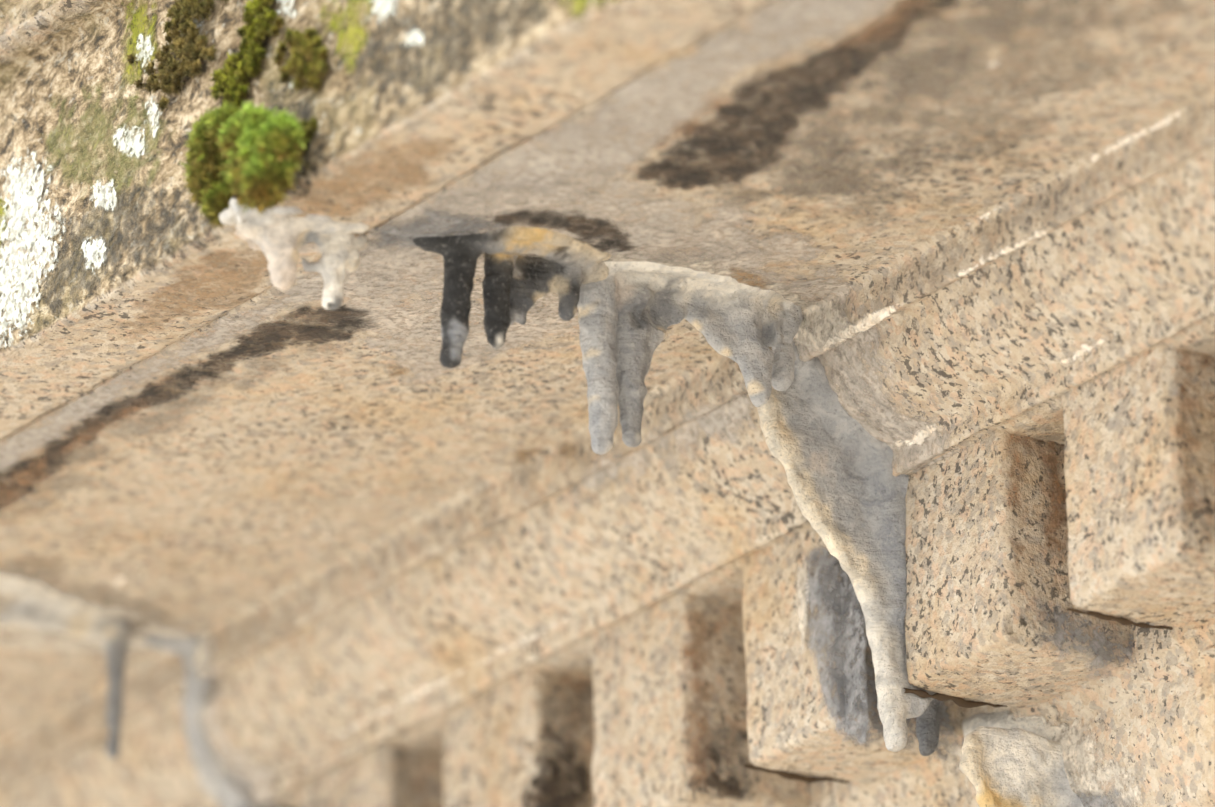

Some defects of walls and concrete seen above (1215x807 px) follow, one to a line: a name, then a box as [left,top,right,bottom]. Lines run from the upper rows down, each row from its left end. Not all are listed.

water stain [0,0,957,756]
water stain [0,573,273,807]
water stain [521,727,589,807]
water stain [689,746,742,799]
water stain [959,710,1119,807]